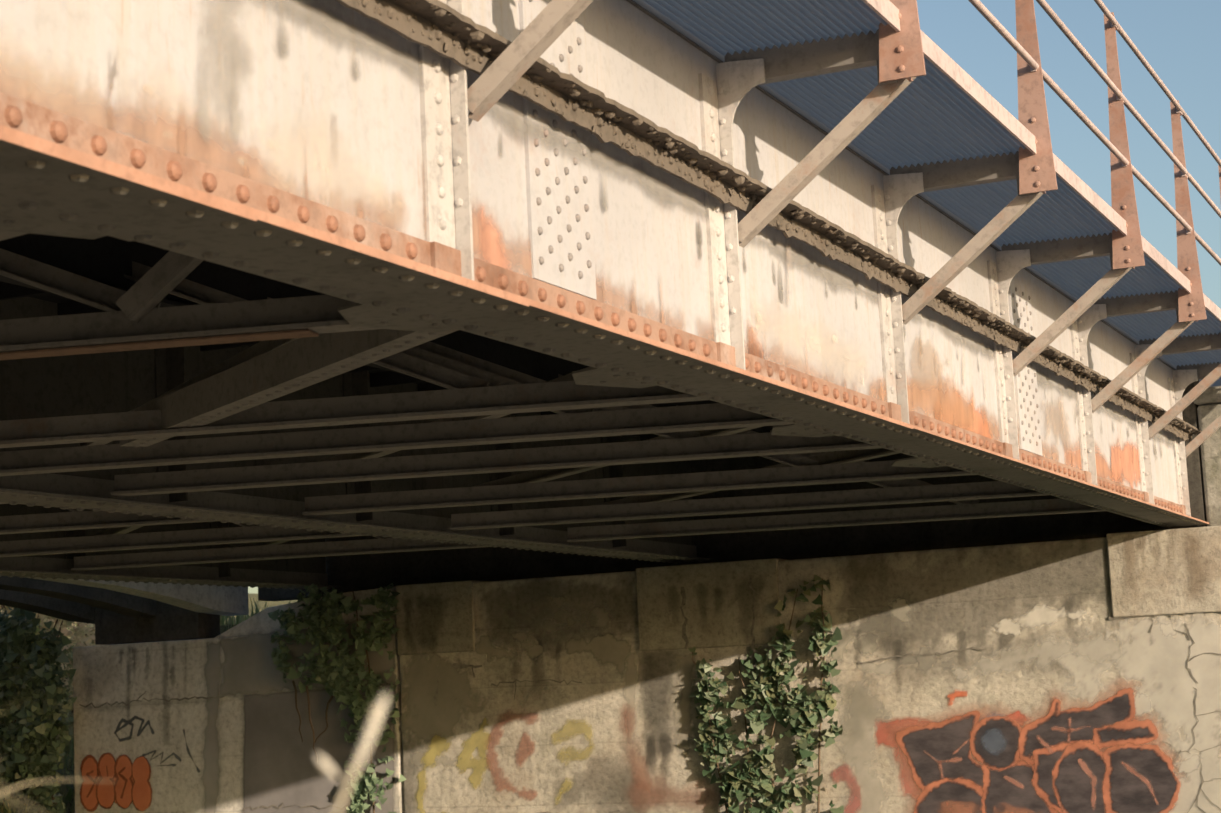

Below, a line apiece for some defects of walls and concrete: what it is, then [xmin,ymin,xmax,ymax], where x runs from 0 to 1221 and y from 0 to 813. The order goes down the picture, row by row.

rust [0,64,307,199]
rust [472,211,537,280]
rust [596,280,640,315]
rust [872,383,1000,440]
rust [1042,443,1141,488]
damp [677,657,694,755]
crack [1109,614,1221,813]